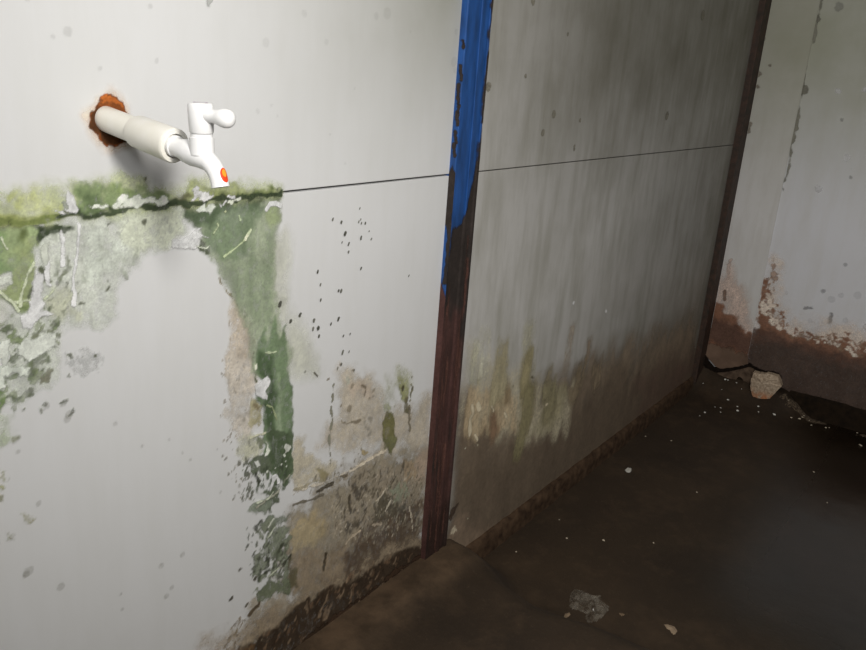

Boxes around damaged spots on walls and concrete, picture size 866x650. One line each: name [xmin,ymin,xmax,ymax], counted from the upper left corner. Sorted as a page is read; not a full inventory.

corrosion [89,94,127,147]
corrosion [481,51,489,123]
peeling [0,186,241,403]
water stain [219,279,262,466]
peeling [255,376,270,399]
peeling [254,442,291,491]
water stain [237,334,431,649]
corrosion [421,64,482,559]
water stain [490,325,556,458]
corrosion [708,258,866,410]